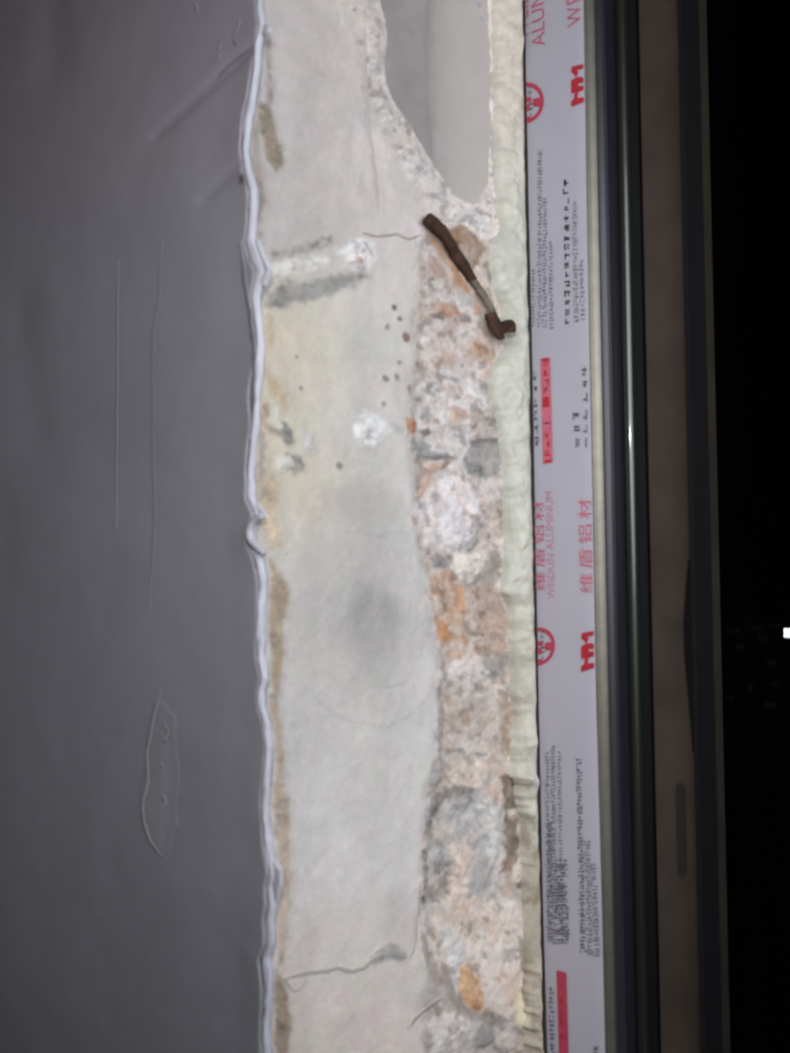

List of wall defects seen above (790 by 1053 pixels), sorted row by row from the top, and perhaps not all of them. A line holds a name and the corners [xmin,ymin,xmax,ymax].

rust [420,217,471,295]
flaking render [338,0,526,1053]
crack [284,879,423,992]